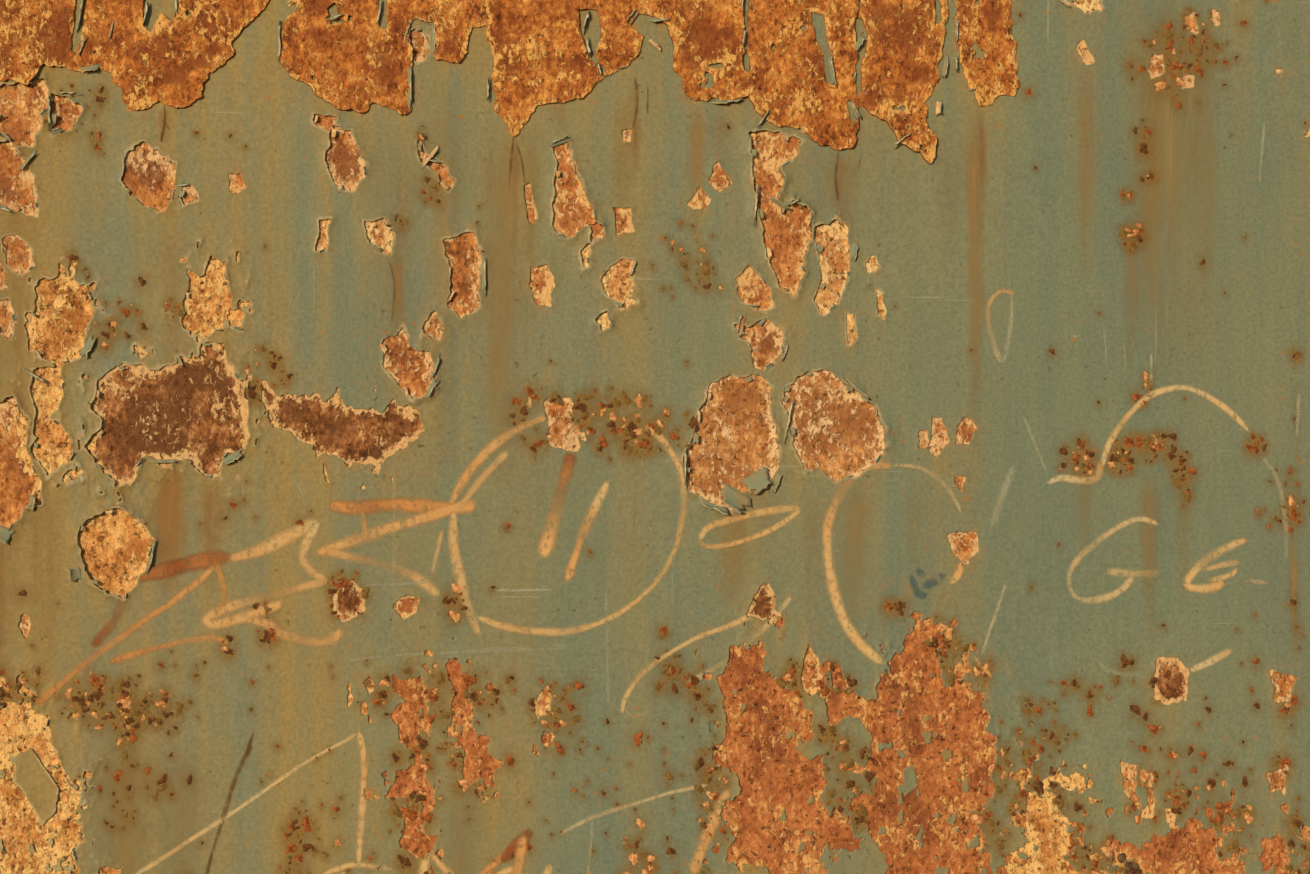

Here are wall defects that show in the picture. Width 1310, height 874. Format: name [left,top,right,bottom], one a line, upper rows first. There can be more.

peeling [404,17,435,63]
peeling [622,129,632,142]
peeling [683,130,886,515]
peeling [0,235,258,599]
corrosion [1059,431,1197,507]
corrosion [744,583,783,628]
peeling [0,675,94,874]
corrosion [654,601,1310,874]
peeling [98,857,122,874]
corrosion [623,808,678,874]
peeling [1004,753,1097,874]